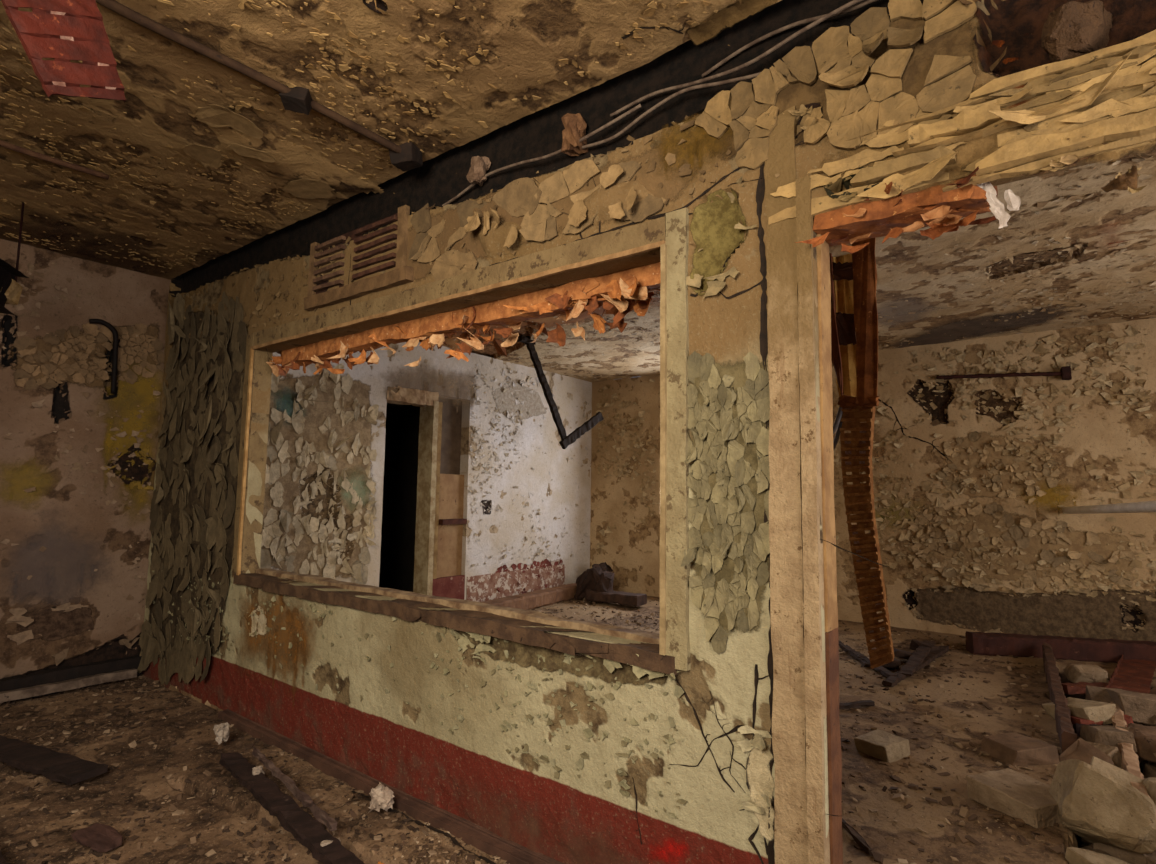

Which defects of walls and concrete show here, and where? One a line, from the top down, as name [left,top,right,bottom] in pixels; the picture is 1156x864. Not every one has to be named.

rust [266,277,660,377]
peeling [1,0,1156,686]
crack [534,163,768,391]
crack [763,420,771,523]
crack [820,539,887,567]
crack [669,553,775,864]